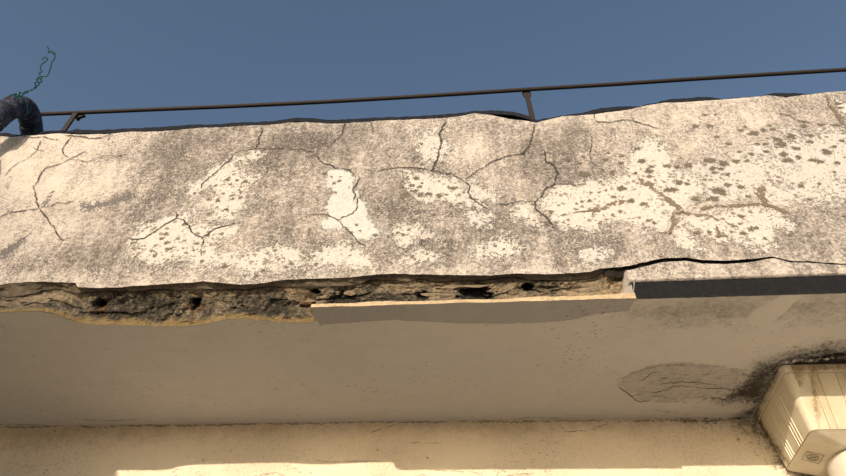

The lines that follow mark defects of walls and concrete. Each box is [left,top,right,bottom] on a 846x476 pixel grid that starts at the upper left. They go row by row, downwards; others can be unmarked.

crack [589,113,660,162]
crack [779,95,846,128]
crack [0,131,127,248]
crack [129,213,238,251]
crack [201,121,625,245]
spalling [0,95,846,326]
crack [637,176,787,237]
crack [604,257,846,278]
water stain [704,342,846,468]